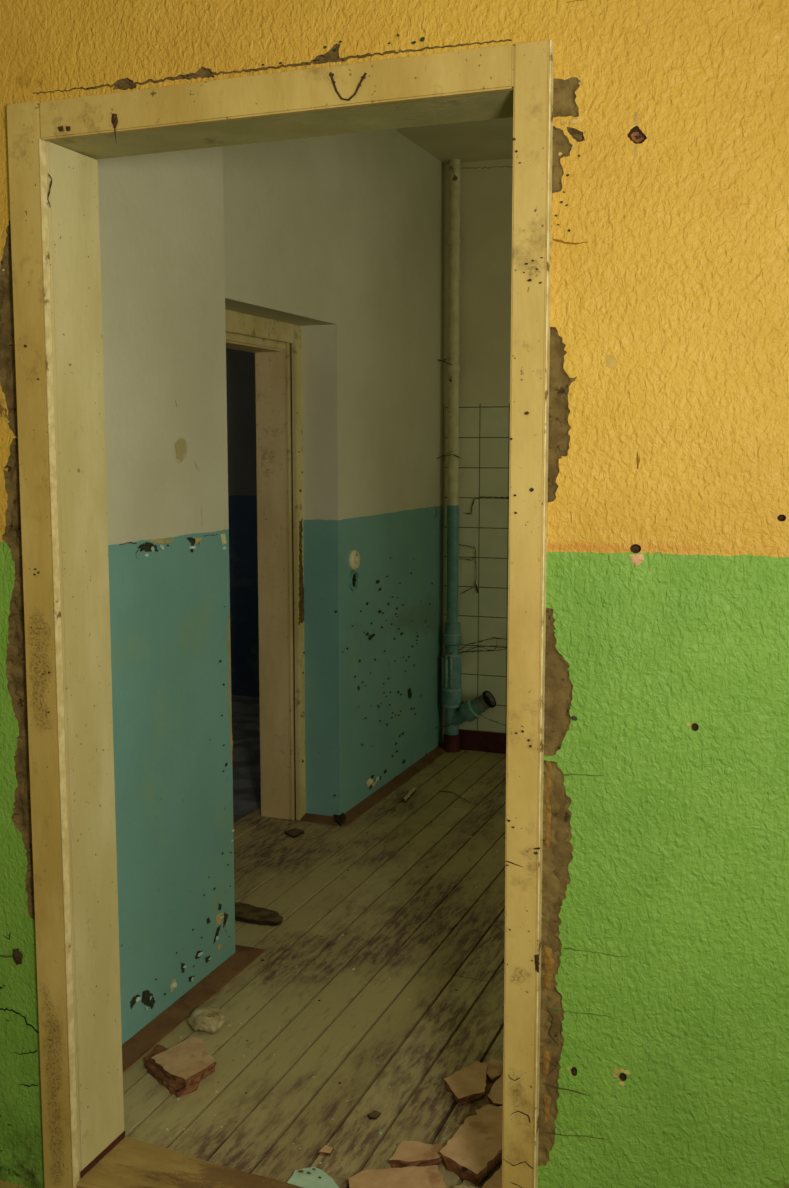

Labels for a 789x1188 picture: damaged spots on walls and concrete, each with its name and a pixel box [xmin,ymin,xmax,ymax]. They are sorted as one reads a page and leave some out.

flaking render [552,77,585,232]
flaking render [548,327,577,502]
flaking render [0,221,35,940]
peeling [120,539,173,558]
peeling [187,534,227,552]
spalling [219,606,233,772]
peeling [130,903,230,1010]
flaking render [538,607,578,1166]